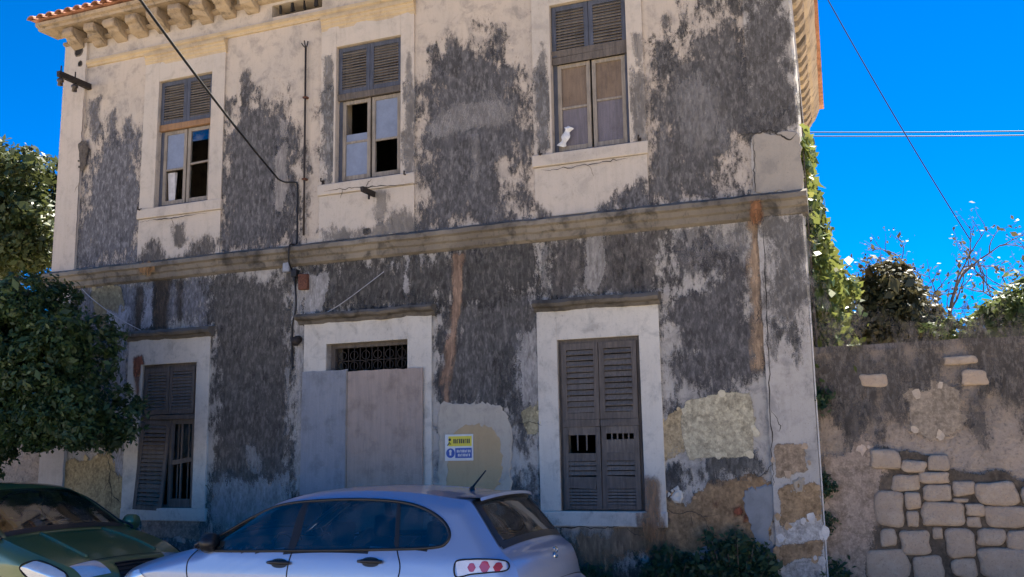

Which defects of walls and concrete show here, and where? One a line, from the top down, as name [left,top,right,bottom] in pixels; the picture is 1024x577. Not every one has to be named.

mould [76,20,551,269]
crack [548,158,626,176]
mould [598,0,806,211]
spalling [787,0,801,156]
peeling [64,451,124,519]
rust [439,253,465,402]
water stain [75,206,1024,551]
flaking render [666,486,697,503]
peeling [663,390,760,461]
rust [746,200,765,370]
crack [757,225,781,485]
spalling [768,380,1024,577]